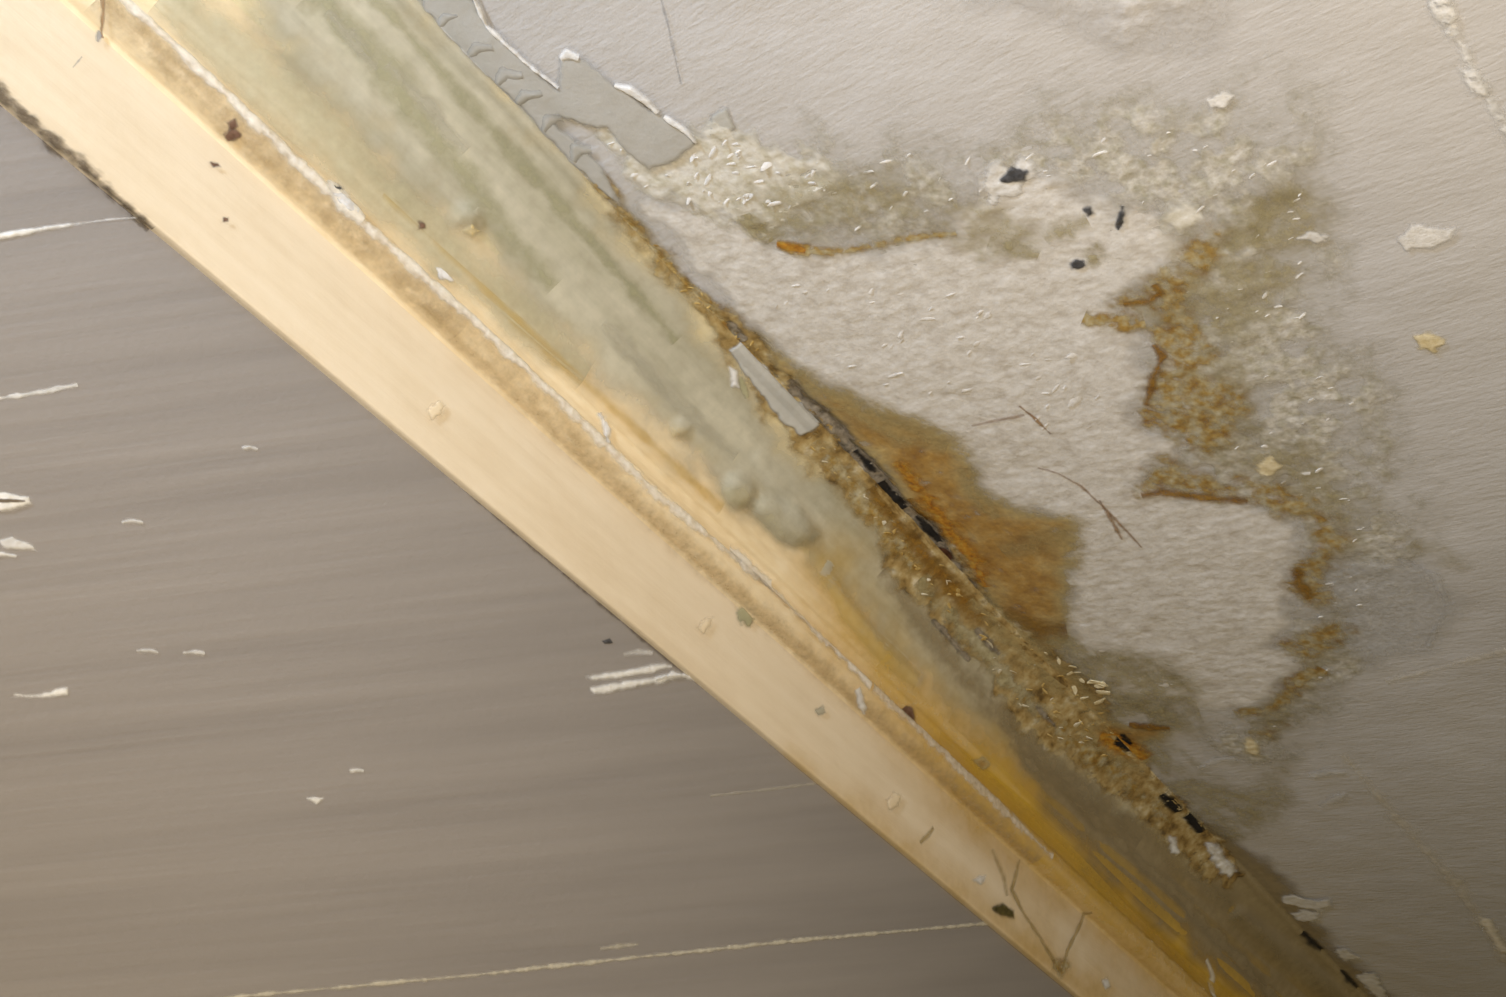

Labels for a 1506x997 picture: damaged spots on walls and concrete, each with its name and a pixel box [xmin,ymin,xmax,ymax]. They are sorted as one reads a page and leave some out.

crack [1428,0,1506,135]
peeling [121,0,1030,835]
damp [155,0,1076,783]
crack [726,321,748,342]
crack [787,378,990,602]
flaking render [423,0,1420,889]
damp [1326,559,1452,656]
damp [879,663,1376,997]